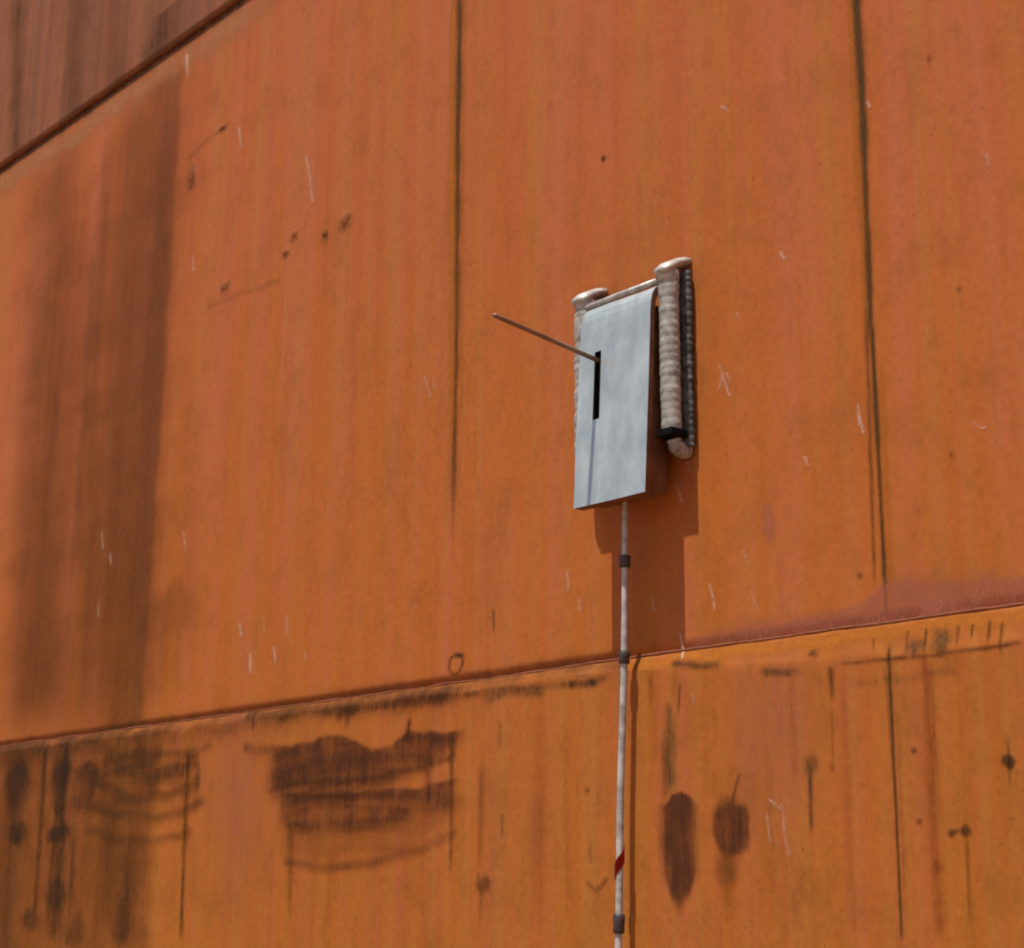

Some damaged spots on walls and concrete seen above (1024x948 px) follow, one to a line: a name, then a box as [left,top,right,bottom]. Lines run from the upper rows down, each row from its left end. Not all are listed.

rust [628,613,1024,669]